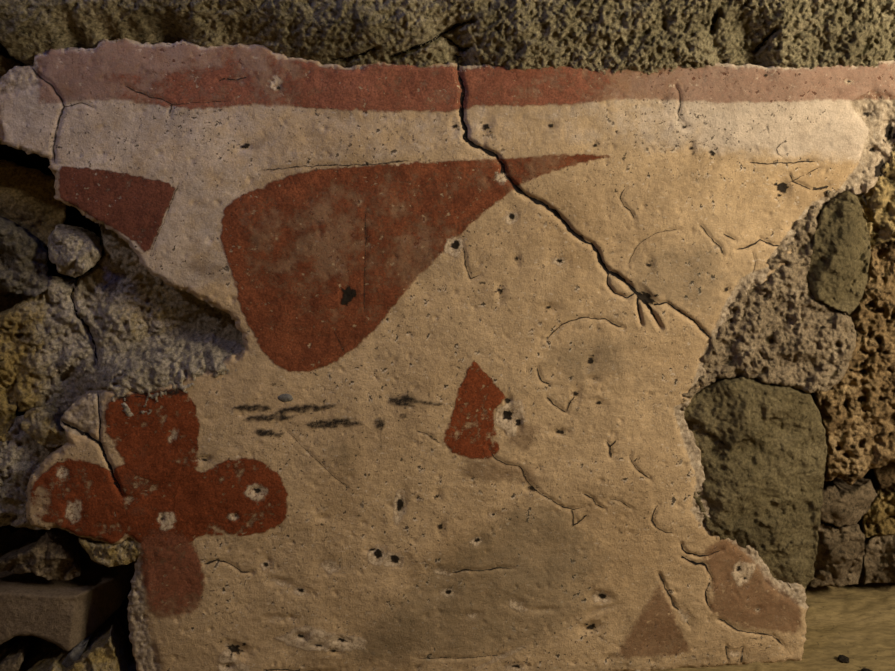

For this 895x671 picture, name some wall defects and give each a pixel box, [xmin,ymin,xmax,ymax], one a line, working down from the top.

crack [710,10,718,31]
crack [755,29,776,52]
crack [332,20,710,340]
crack [700,225,779,272]
flaking render [0,224,245,419]
flaking render [680,190,856,411]
crack [62,396,123,496]
spalling [65,500,82,523]
spalling [158,512,176,531]
spalling [733,562,755,586]